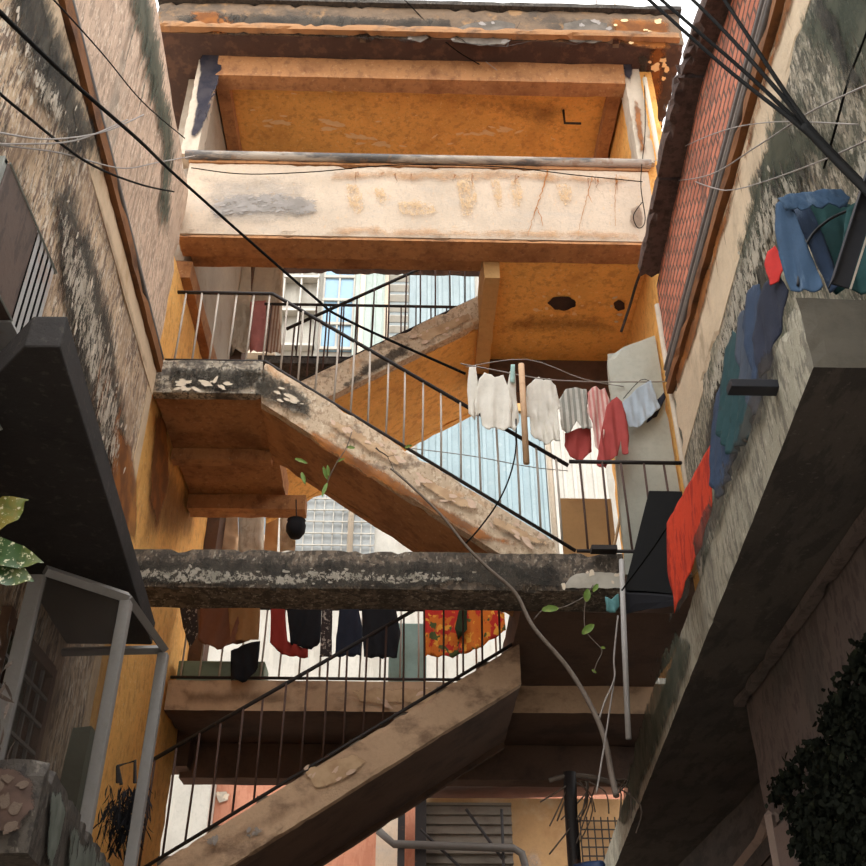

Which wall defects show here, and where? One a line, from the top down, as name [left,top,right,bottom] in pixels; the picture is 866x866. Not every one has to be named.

spalling [451,20,515,46]
water stain [11,0,105,170]
water stain [124,0,176,235]
water stain [191,55,222,136]
crack [528,169,549,233]
water stain [48,166,126,466]
spalling [532,289,584,317]
peeling [173,368,308,414]
peeling [488,514,547,549]
peeling [140,564,462,587]
peeling [561,569,620,590]
peeling [0,767,35,835]